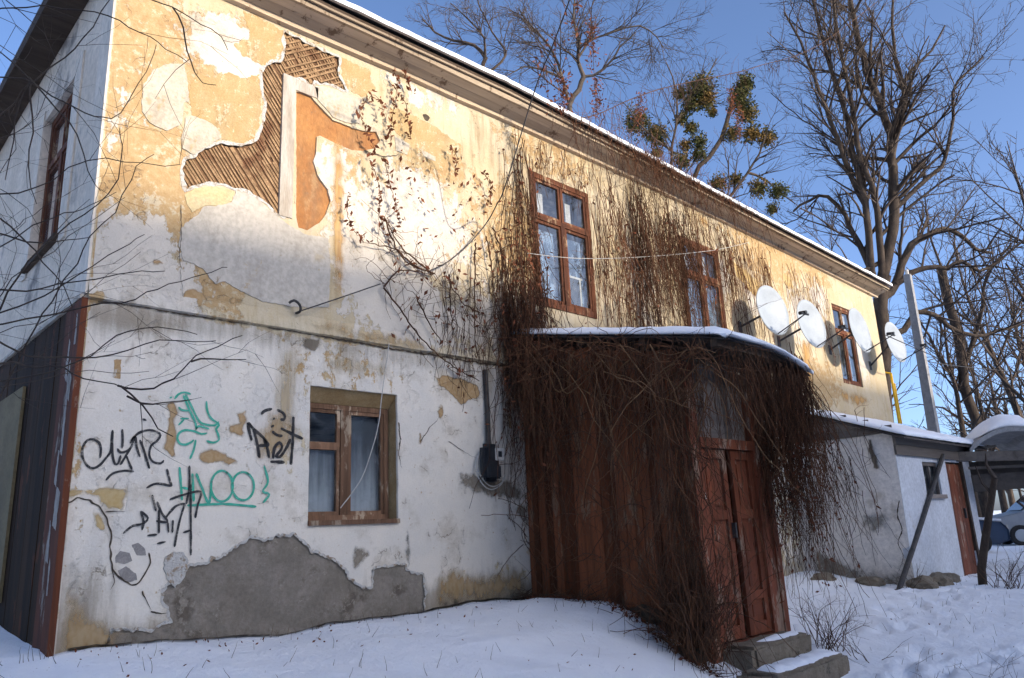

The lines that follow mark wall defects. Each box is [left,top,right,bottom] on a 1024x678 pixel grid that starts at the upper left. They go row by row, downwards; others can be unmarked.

spalling [180,11,379,230]
peeling [184,289,206,300]
peeling [437,375,479,405]
peeling [229,412,246,436]
peeling [46,314,125,596]
peeling [200,450,236,465]
spalling [103,532,428,647]
leakage [439,572,521,606]